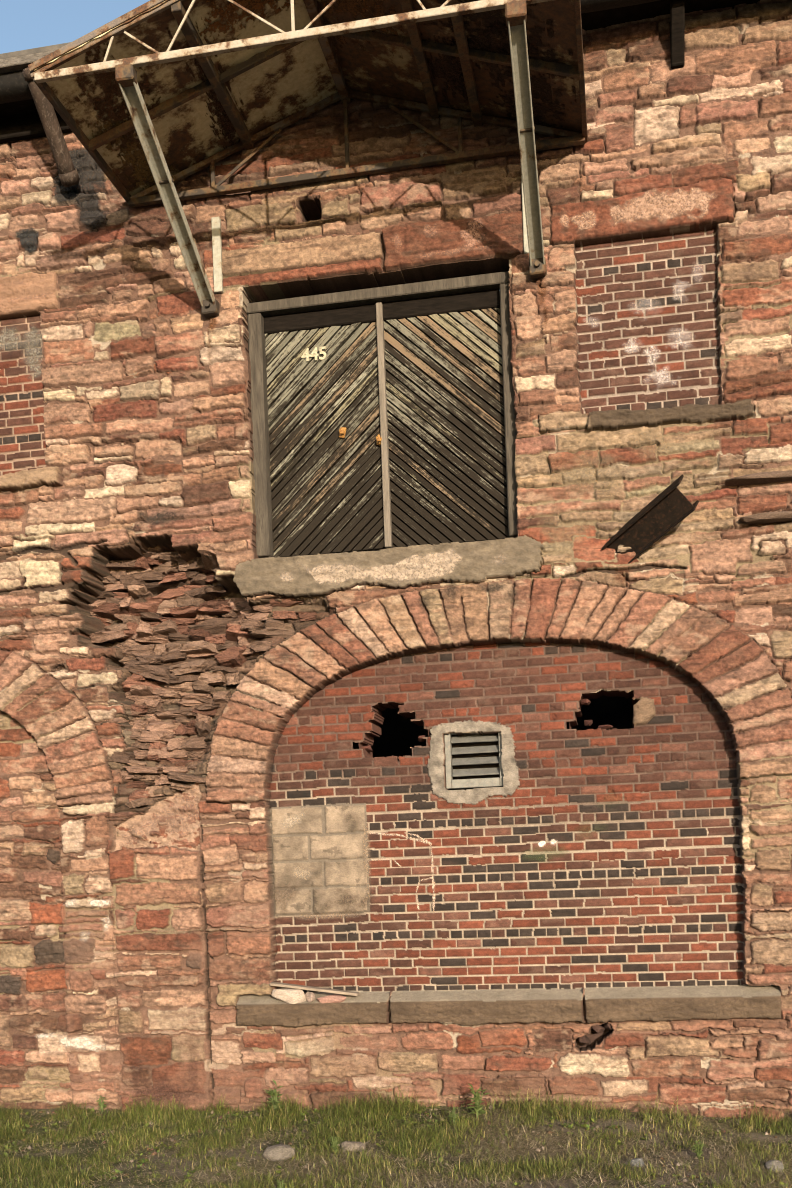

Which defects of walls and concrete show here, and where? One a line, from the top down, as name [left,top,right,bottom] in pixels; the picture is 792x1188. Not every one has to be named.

rust [321,0,404,51]
rust [137,67,161,111]
rust [167,0,291,149]
rust [75,41,155,190]
peeling [306,550,462,584]
peeling [88,545,316,844]
hole [359,702,431,762]
hole [569,689,640,731]
hole [575,1023,614,1051]